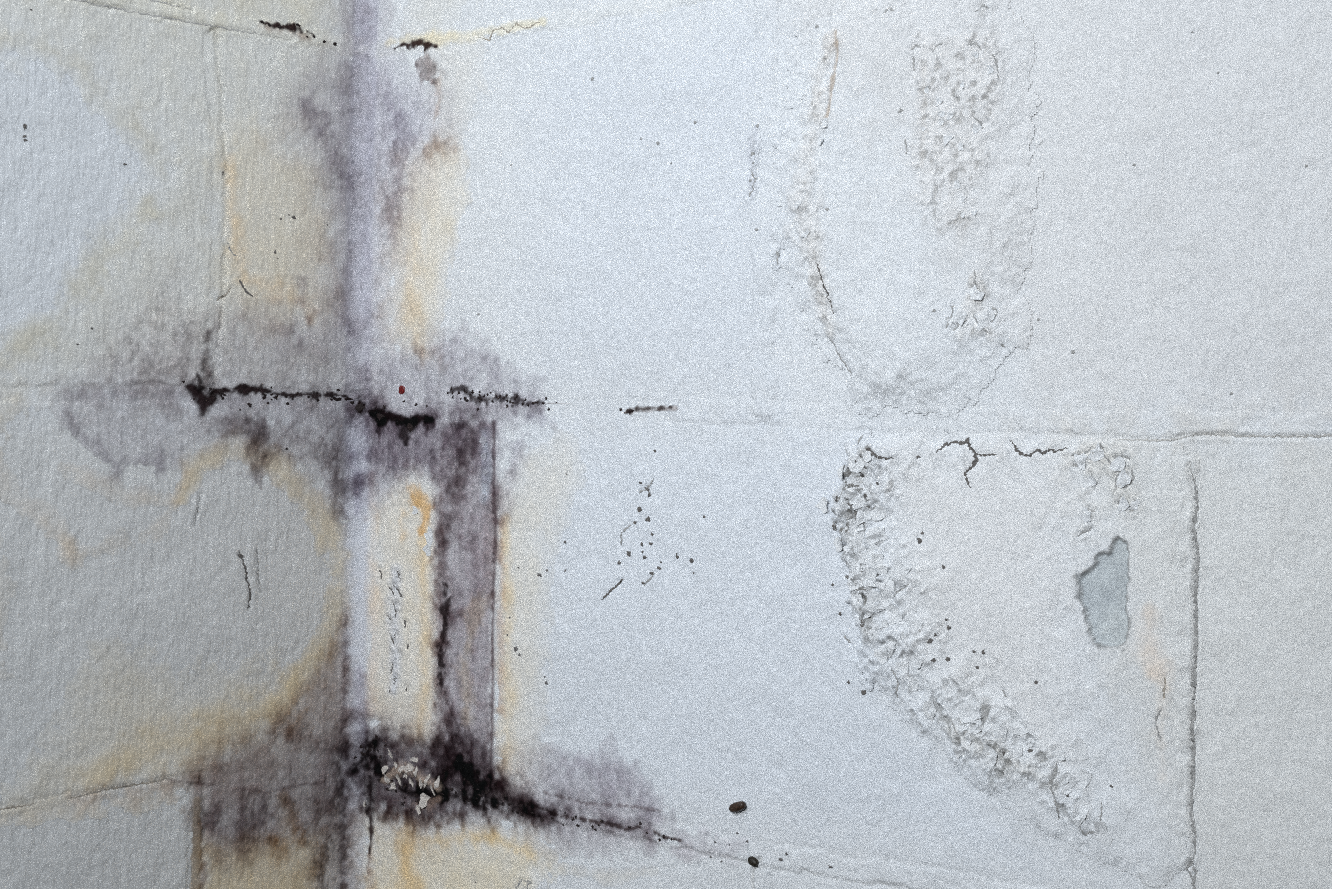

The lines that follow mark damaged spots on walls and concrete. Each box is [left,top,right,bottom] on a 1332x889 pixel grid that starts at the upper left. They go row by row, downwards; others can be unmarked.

rust [224,129,323,319]
water stain [0,0,750,889]
rust [364,475,435,736]
spalling [815,425,1113,846]
crack [936,437,1067,488]
spalling [1081,533,1133,647]